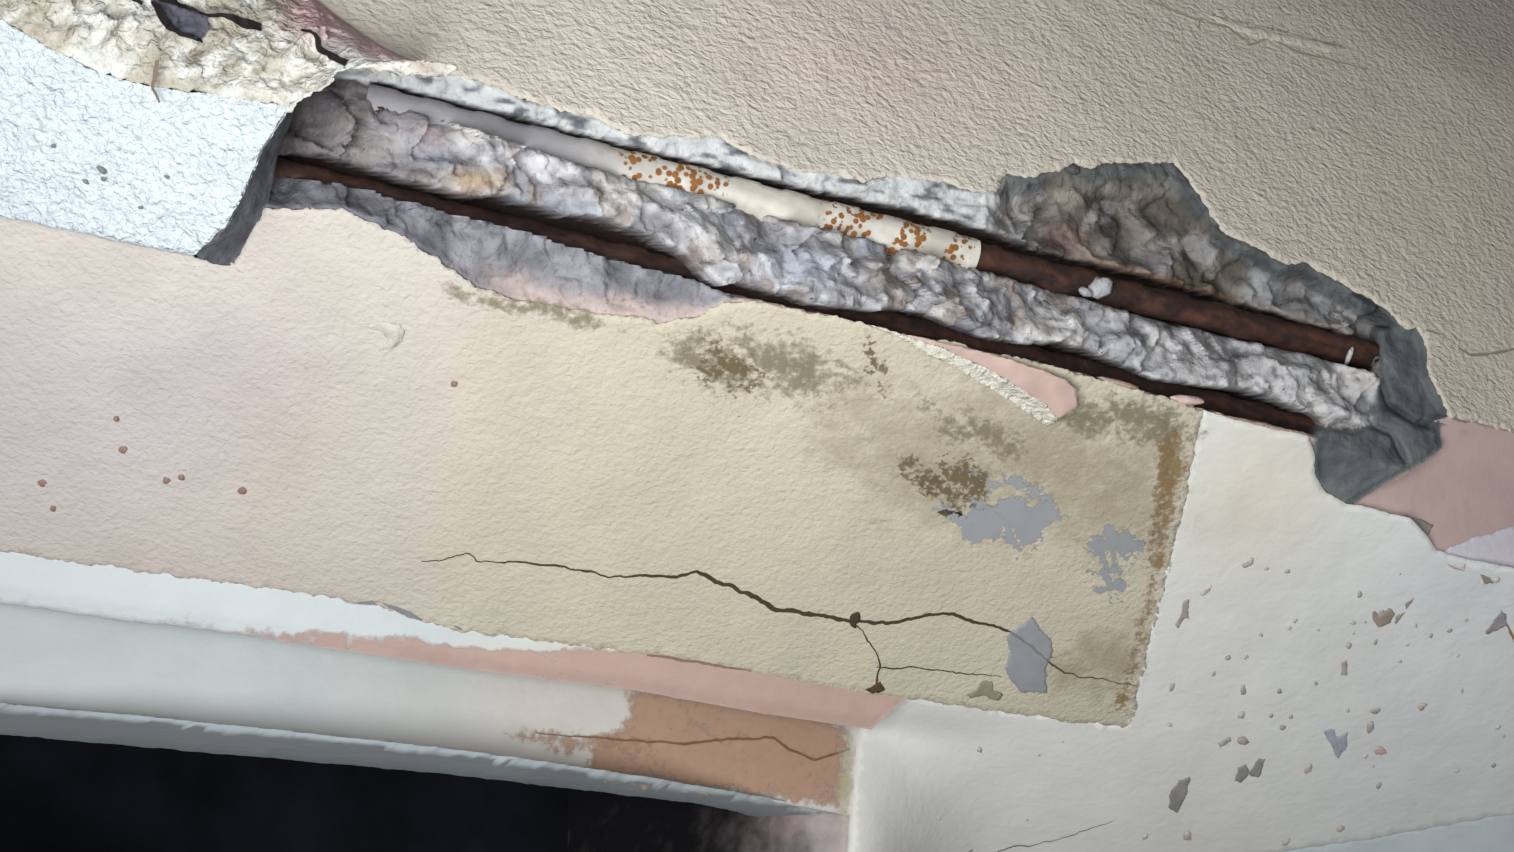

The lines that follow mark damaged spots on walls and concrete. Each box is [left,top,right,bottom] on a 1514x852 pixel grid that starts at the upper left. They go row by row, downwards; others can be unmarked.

crack [208,13,262,31]
crack [301,29,348,66]
rust [619,148,728,194]
rust [818,199,931,256]
rust [939,235,975,265]
spalling [262,68,1514,584]
damp [660,335,891,399]
damp [1060,401,1182,441]
damp [898,417,1016,513]
crack [421,553,1135,686]
peeling [967,616,1053,701]
spalling [1341,598,1468,676]